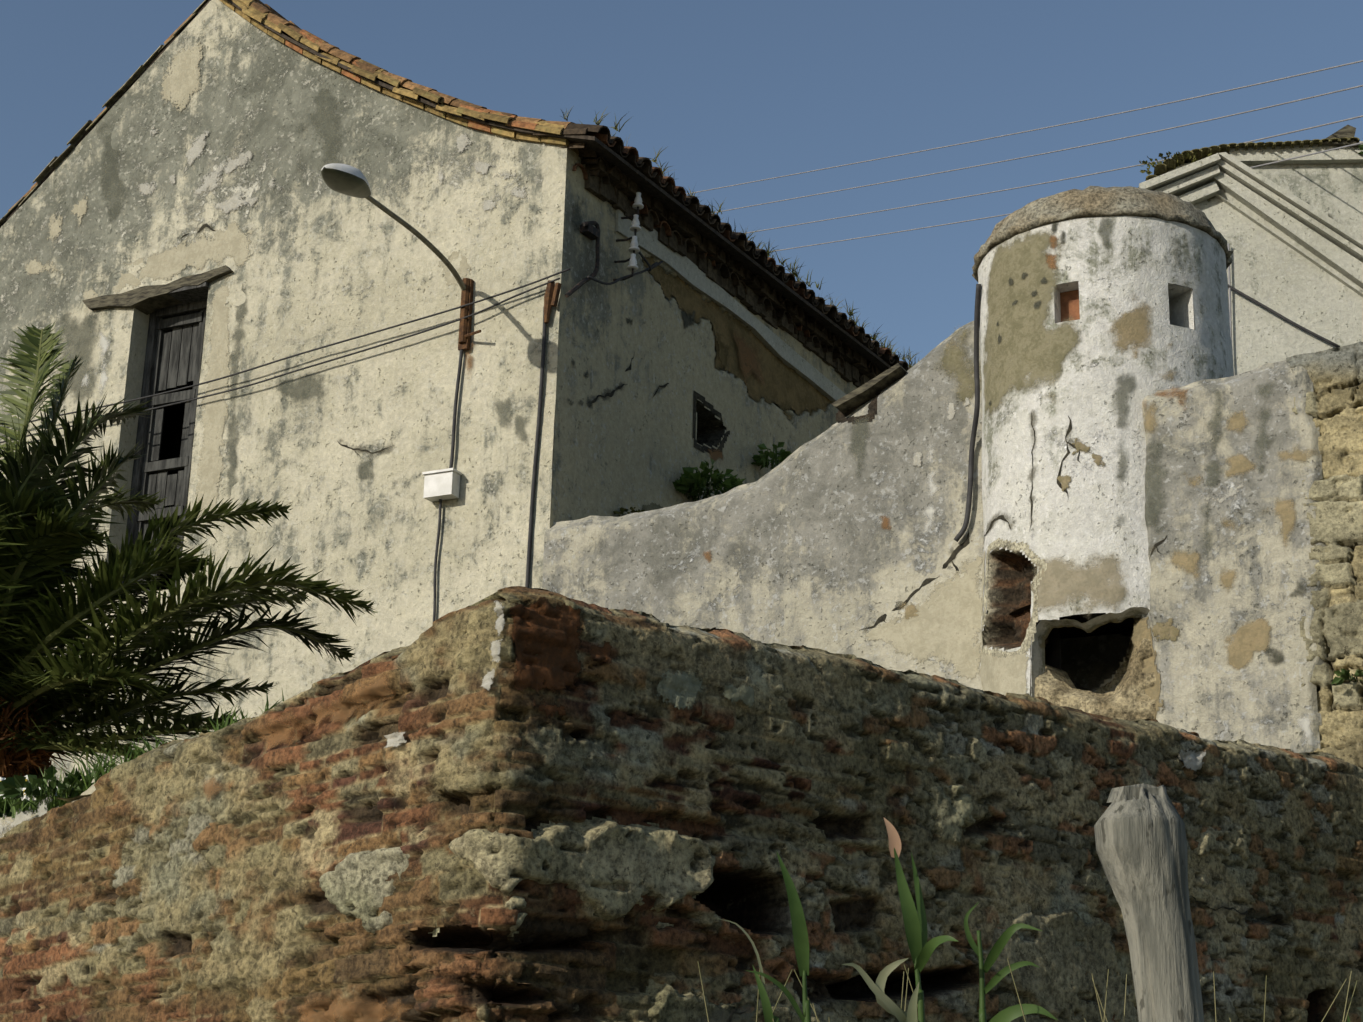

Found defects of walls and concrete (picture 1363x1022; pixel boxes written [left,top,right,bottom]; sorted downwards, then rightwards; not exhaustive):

flaking render [160,42,204,112]
leakage [61,314,109,403]
leakage [230,289,246,400]
crack [589,352,669,403]
spalling [643,256,881,424]
spalling [941,232,1080,421]
spalling [1111,304,1151,357]
leakage [227,416,237,496]
crack [861,412,1101,631]
efflorescence [481,601,505,691]
spalling [1226,618,1271,669]
efflorescence [384,732,407,748]